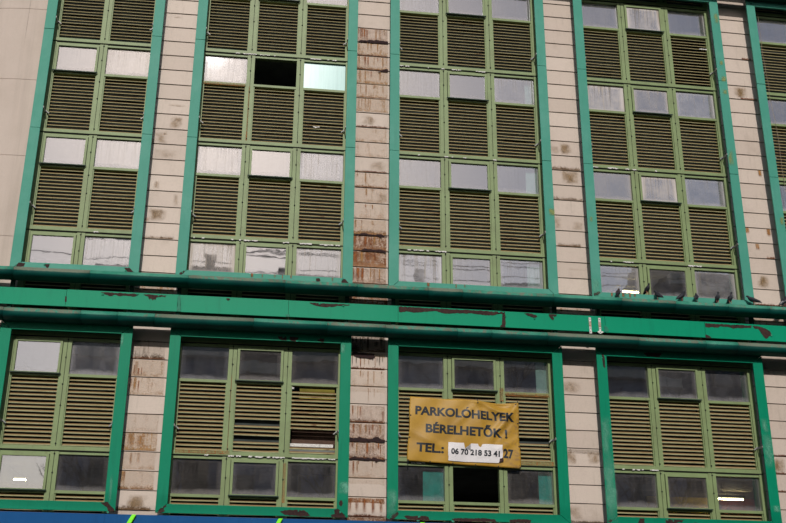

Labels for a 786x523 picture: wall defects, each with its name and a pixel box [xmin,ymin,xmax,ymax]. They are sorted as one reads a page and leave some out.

rust [356,28,388,128]
rust [353,218,387,285]
peeling [399,306,506,327]
peeling [705,323,773,339]
rust [351,337,385,375]
rust [349,406,385,472]
rust [345,498,386,521]